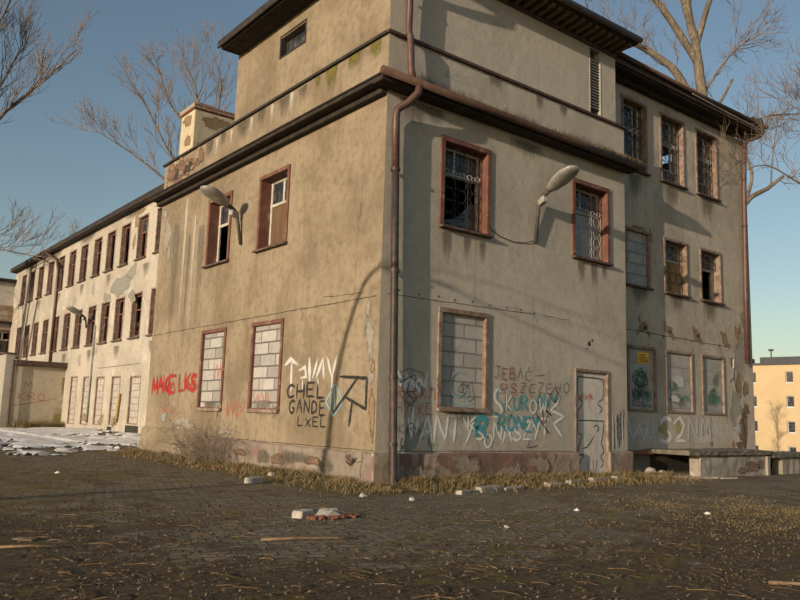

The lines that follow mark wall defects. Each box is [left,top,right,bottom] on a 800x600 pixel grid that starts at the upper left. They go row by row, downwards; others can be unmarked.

spalling [165,115,204,188]
peeling [719,312,750,449]